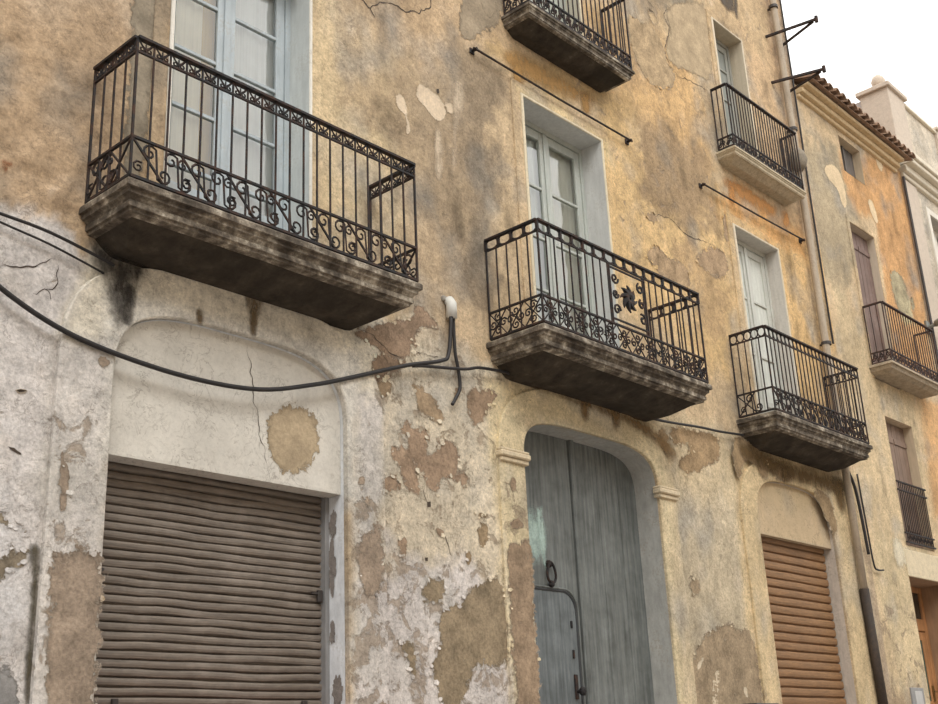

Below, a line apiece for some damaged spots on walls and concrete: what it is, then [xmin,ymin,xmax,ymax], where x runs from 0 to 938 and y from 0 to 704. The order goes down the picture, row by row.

crack [363,0,431,17]
crack [4,259,59,299]
damp [91,243,143,324]
peeling [355,302,440,399]
peeling [58,451,74,511]
crack [247,346,268,469]
peeling [384,382,470,497]
peeling [453,386,498,428]
peeling [658,426,721,477]
peeling [355,521,386,598]
peeling [43,544,108,704]
peeling [420,511,542,704]